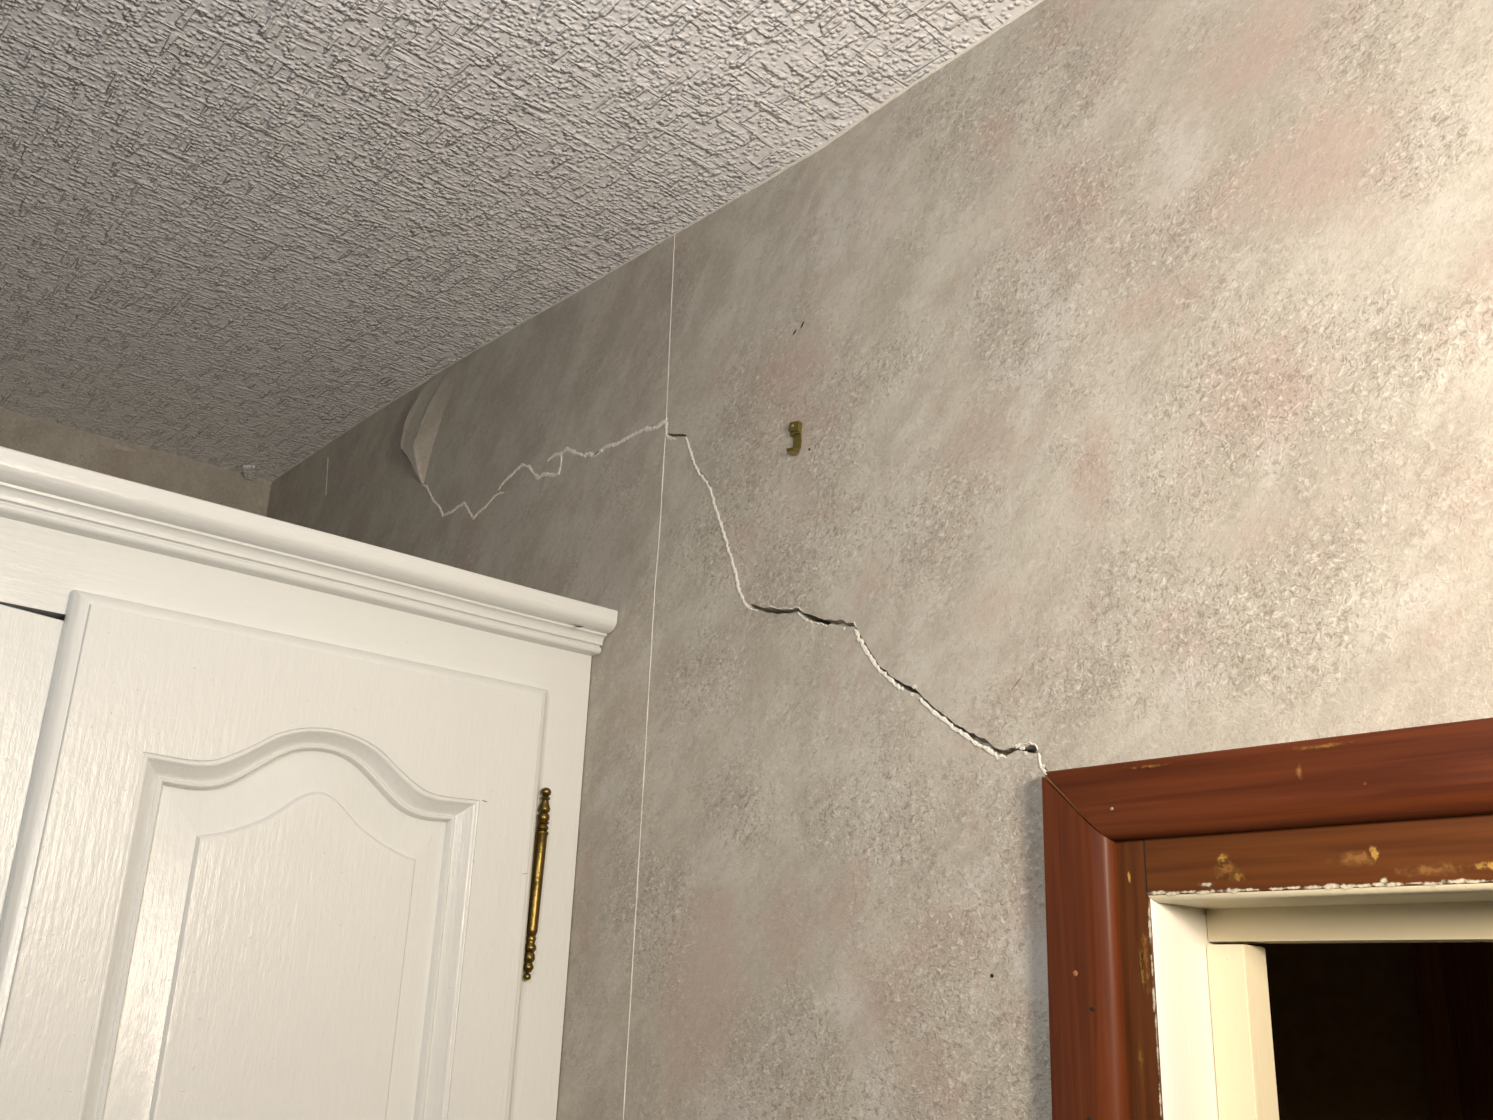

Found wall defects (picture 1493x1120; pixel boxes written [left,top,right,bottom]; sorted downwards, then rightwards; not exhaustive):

crack [421,418,1048,775]